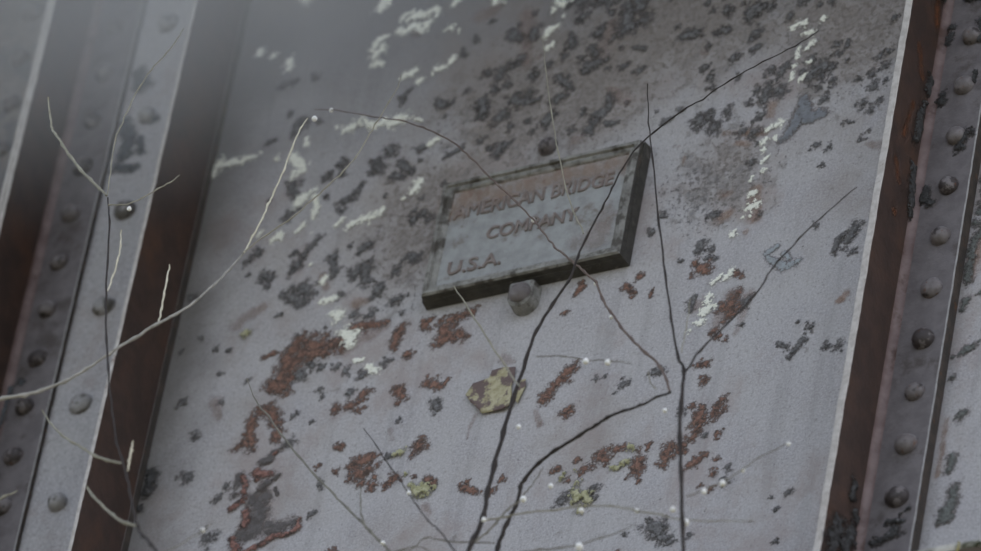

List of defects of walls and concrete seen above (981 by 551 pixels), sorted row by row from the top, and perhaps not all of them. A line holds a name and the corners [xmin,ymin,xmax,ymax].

peeling [541,0,574,51]
peeling [335,110,423,135]
peeling [728,14,829,239]
peeling [211,135,312,181]
peeling [256,185,321,245]
corrosion [689,257,715,280]
peeling [315,274,382,375]
corrosion [707,269,745,343]
corrosion [227,304,481,454]
corrosion [537,359,582,407]
corrosion [692,357,713,387]
corrosion [549,392,730,494]